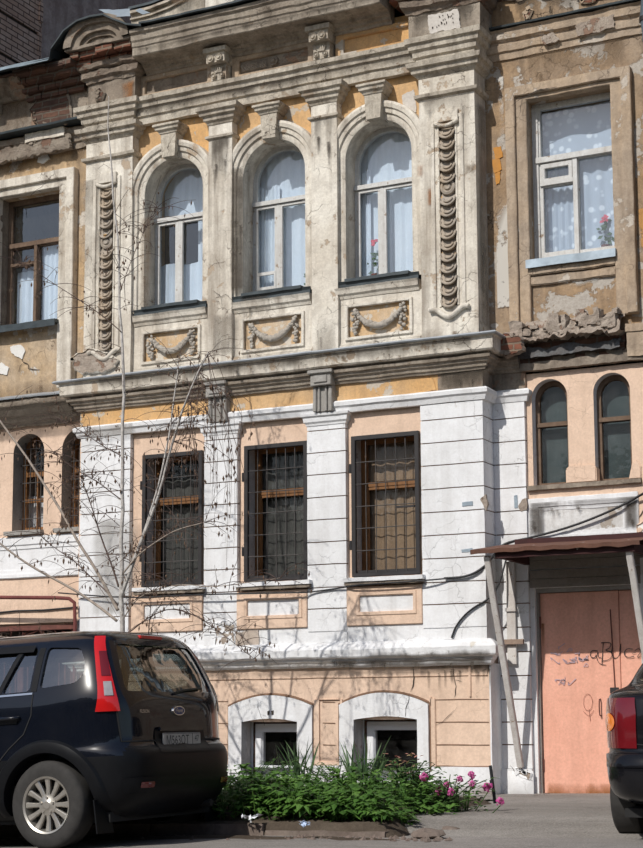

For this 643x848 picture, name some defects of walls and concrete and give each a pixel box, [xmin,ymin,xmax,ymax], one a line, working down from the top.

flaking render [29,93,72,134]
peeling [492,146,503,185]
peeling [497,205,509,308]
peeling [10,345,26,359]